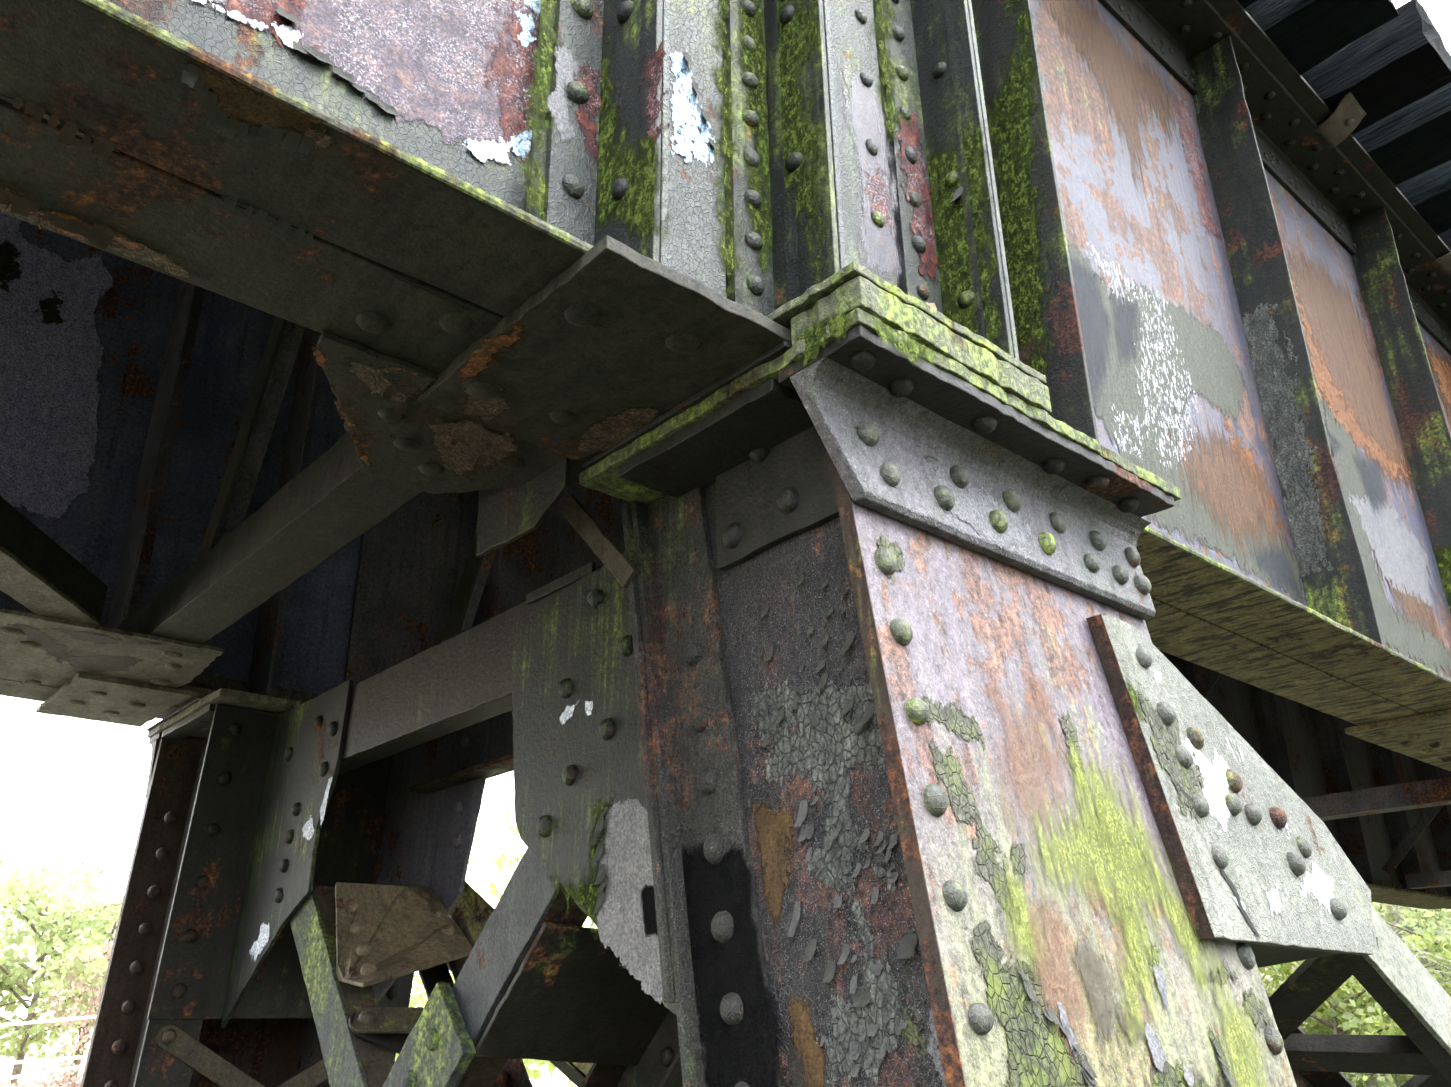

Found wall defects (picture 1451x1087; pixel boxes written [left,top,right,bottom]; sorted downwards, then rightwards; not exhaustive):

peeling [193,0,398,116]
peeling [459,130,532,166]
peeling [669,47,718,167]
corrosion [1045,0,1222,241]
peeling [0,212,114,520]
corrosion [312,324,524,483]
corrosion [1168,410,1295,559]
peeling [550,798,663,1004]
corrosion [753,802,794,928]
peeling [752,586,946,1087]
corrosion [787,996,826,1087]
water stain [1074,936,1146,1052]